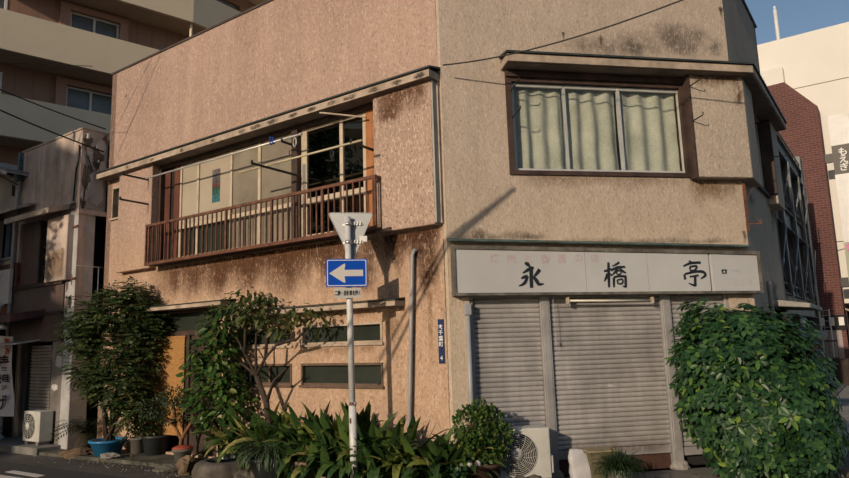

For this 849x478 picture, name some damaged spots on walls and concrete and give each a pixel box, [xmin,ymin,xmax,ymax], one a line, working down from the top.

damp [380,86,422,119]